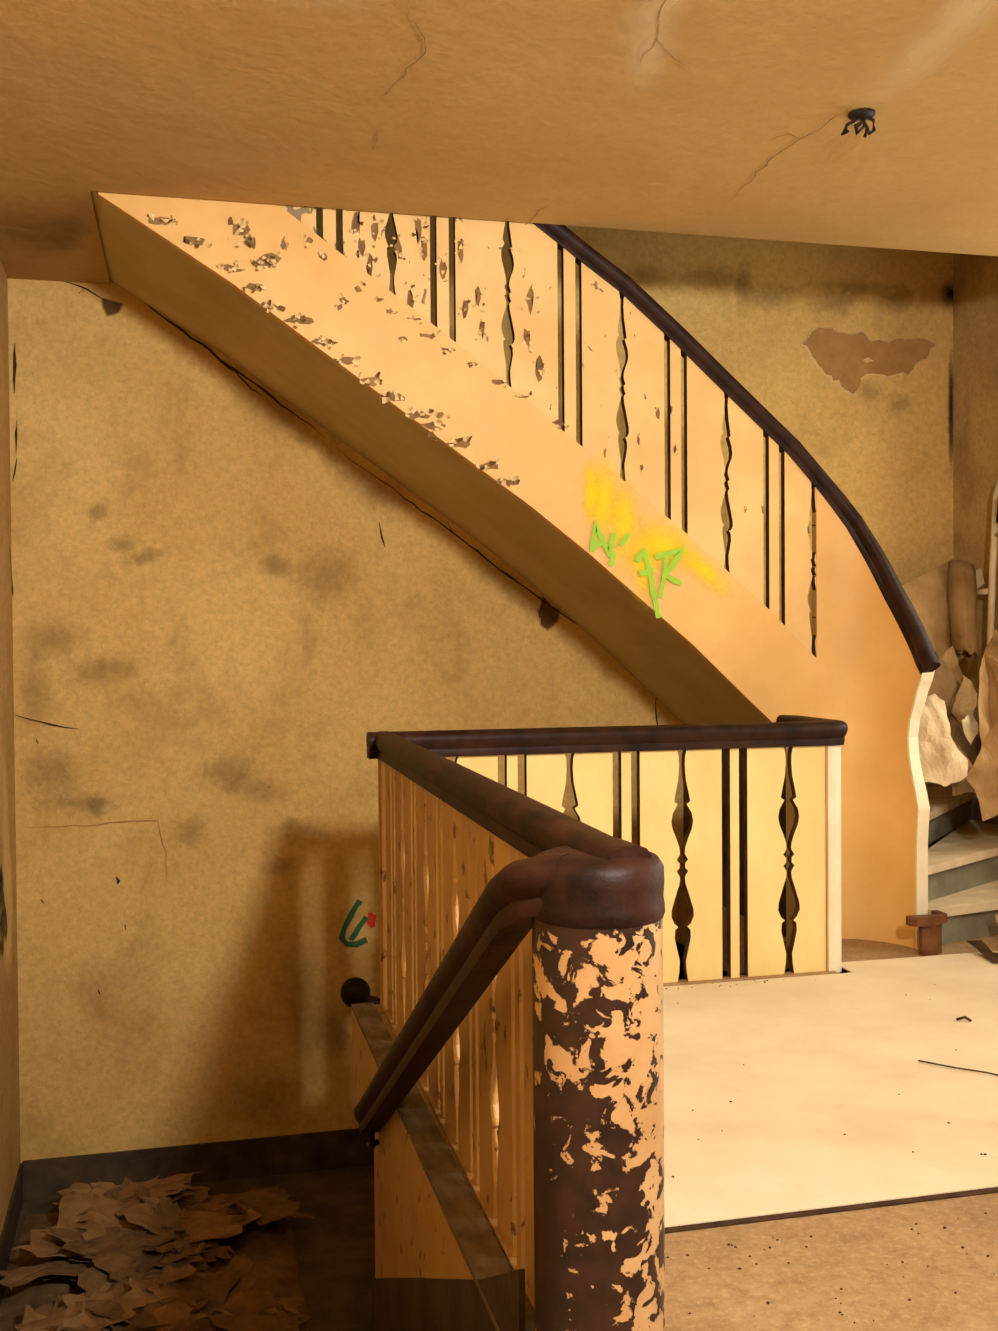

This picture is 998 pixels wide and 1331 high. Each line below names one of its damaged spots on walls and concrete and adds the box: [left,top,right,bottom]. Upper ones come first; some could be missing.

crack [640,0,691,69]
crack [736,103,855,196]
peeling [148,213,212,247]
peeling [215,211,472,448]
peeling [458,286,486,340]
peeling [492,284,545,398]
peeling [801,327,936,396]
peeling [474,459,520,487]